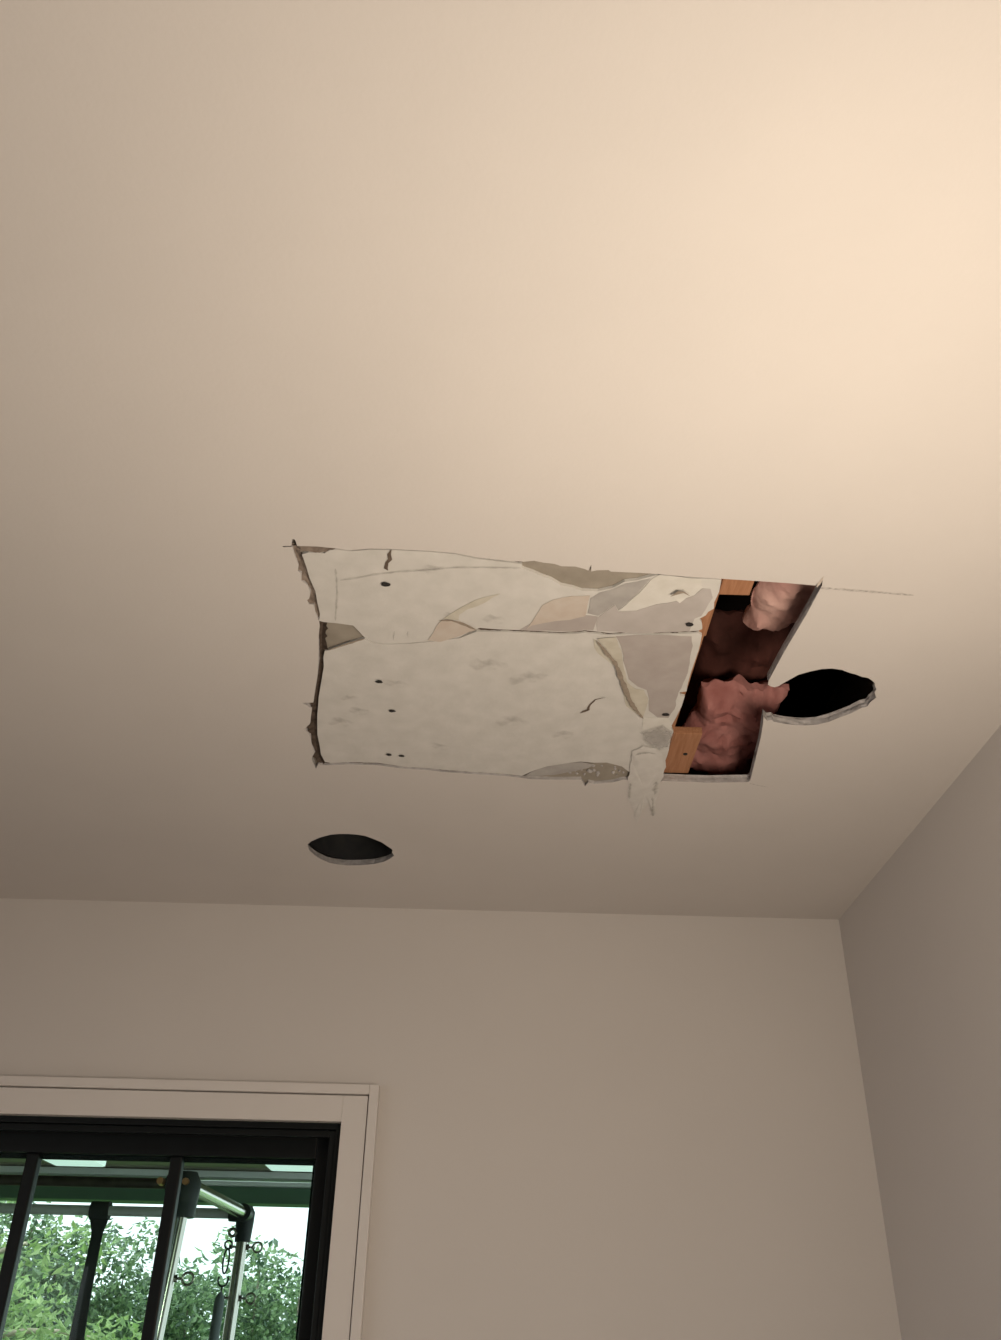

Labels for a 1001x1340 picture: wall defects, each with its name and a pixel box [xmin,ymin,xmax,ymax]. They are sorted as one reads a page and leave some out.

spalling [283,539,628,786]
hole [767,580,823,682]
hole [661,683,876,783]